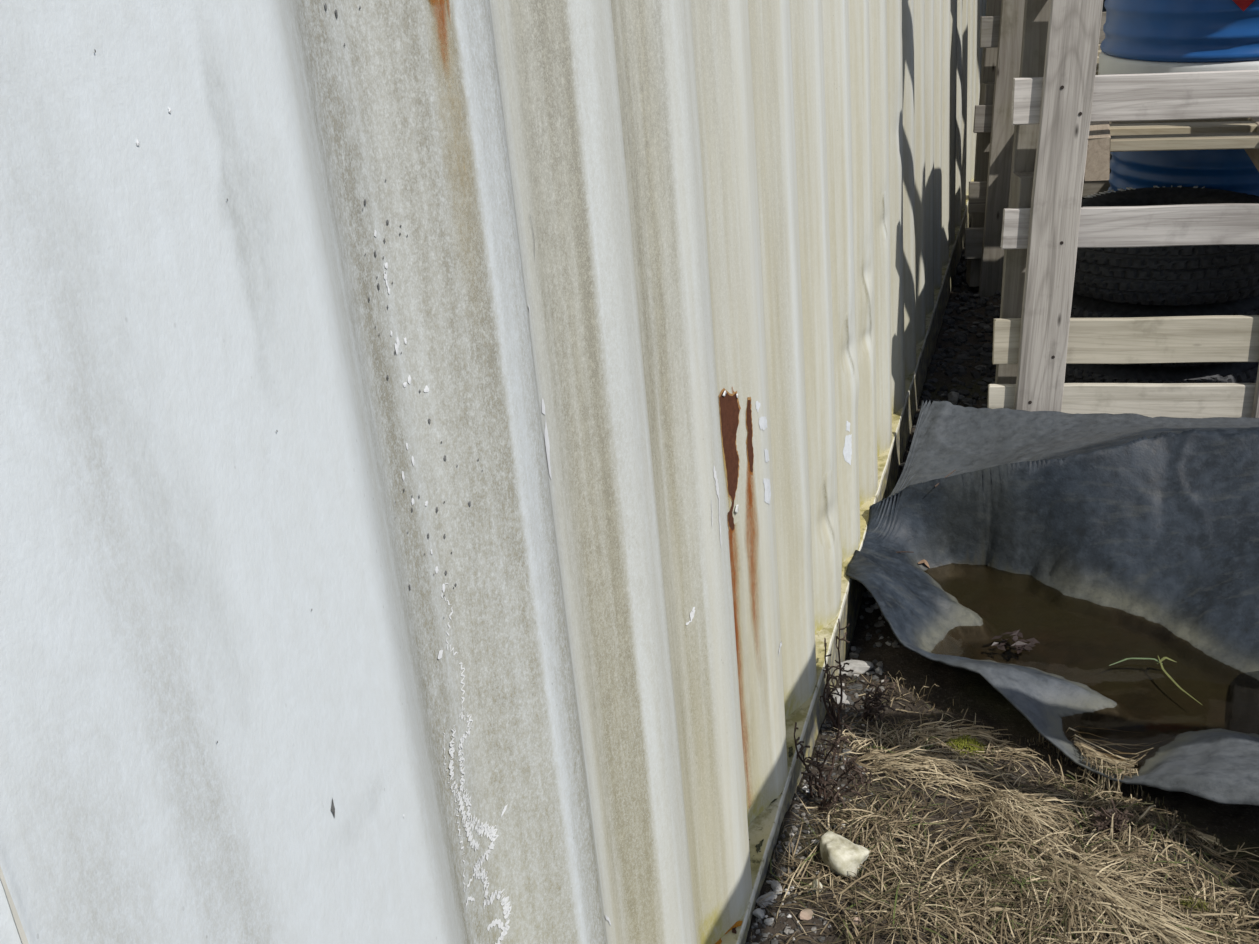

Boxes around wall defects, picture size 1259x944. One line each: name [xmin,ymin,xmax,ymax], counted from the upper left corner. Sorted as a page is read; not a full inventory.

rust [434,0,449,50]
rust [746,397,755,619]